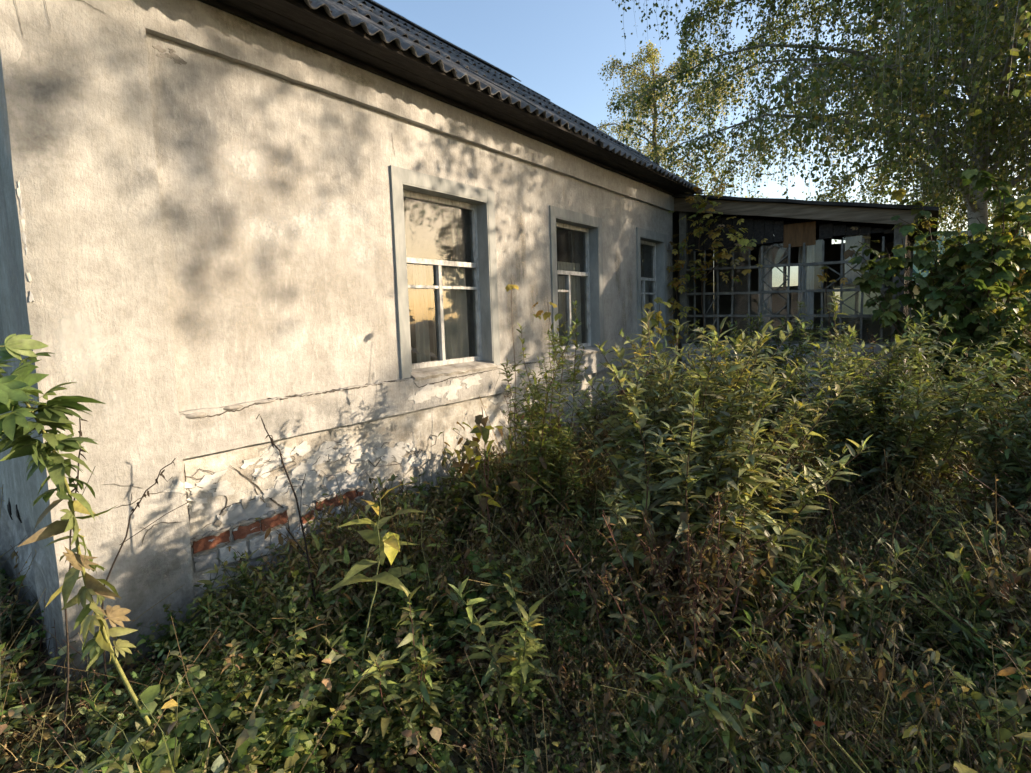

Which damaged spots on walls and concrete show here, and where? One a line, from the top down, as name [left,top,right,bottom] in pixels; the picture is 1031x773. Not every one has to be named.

spalling [17,181,27,255]
peeling [407,374,482,404]
peeling [163,439,427,578]